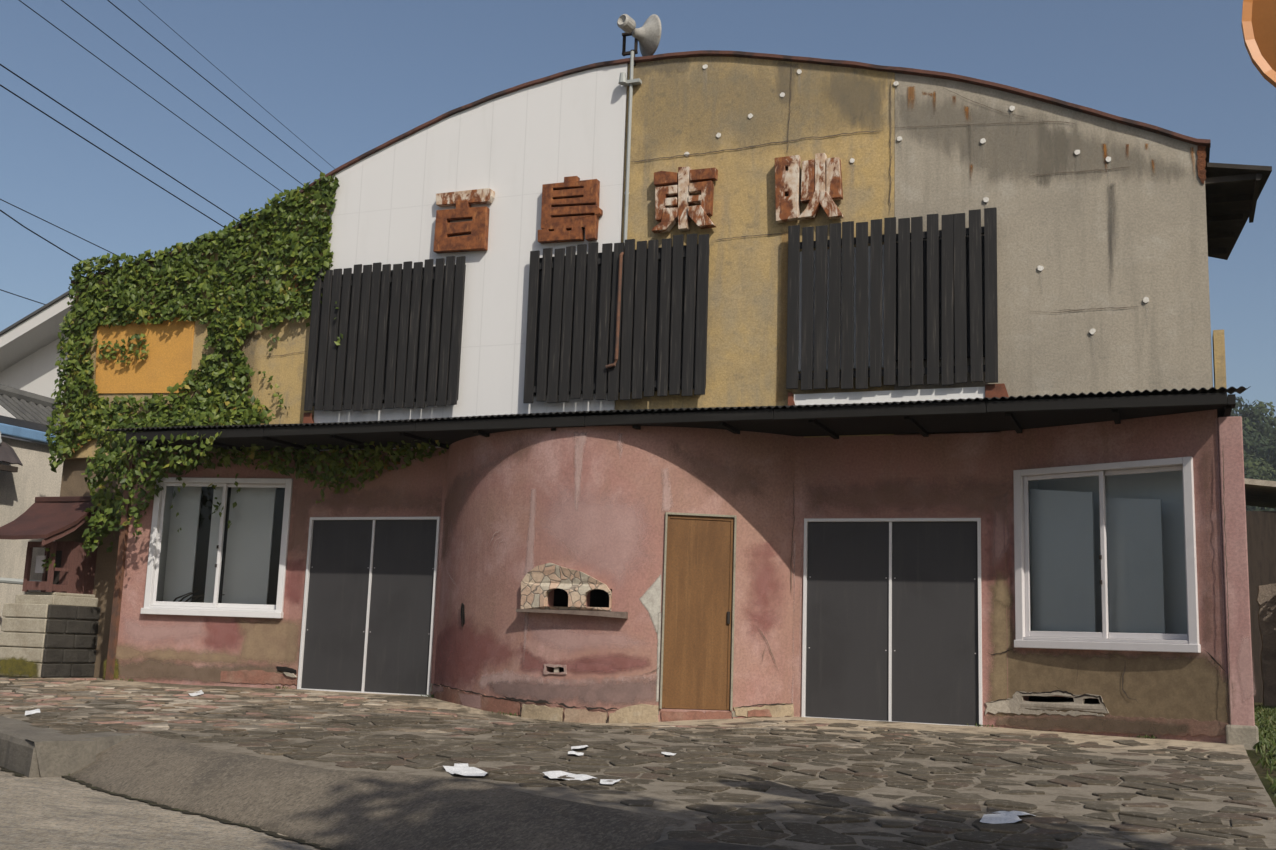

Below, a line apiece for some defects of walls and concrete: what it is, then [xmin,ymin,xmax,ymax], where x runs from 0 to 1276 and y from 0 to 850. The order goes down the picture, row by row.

rust [908,86,936,110]
water stain [435,612,657,706]
peeling [990,551,1230,734]